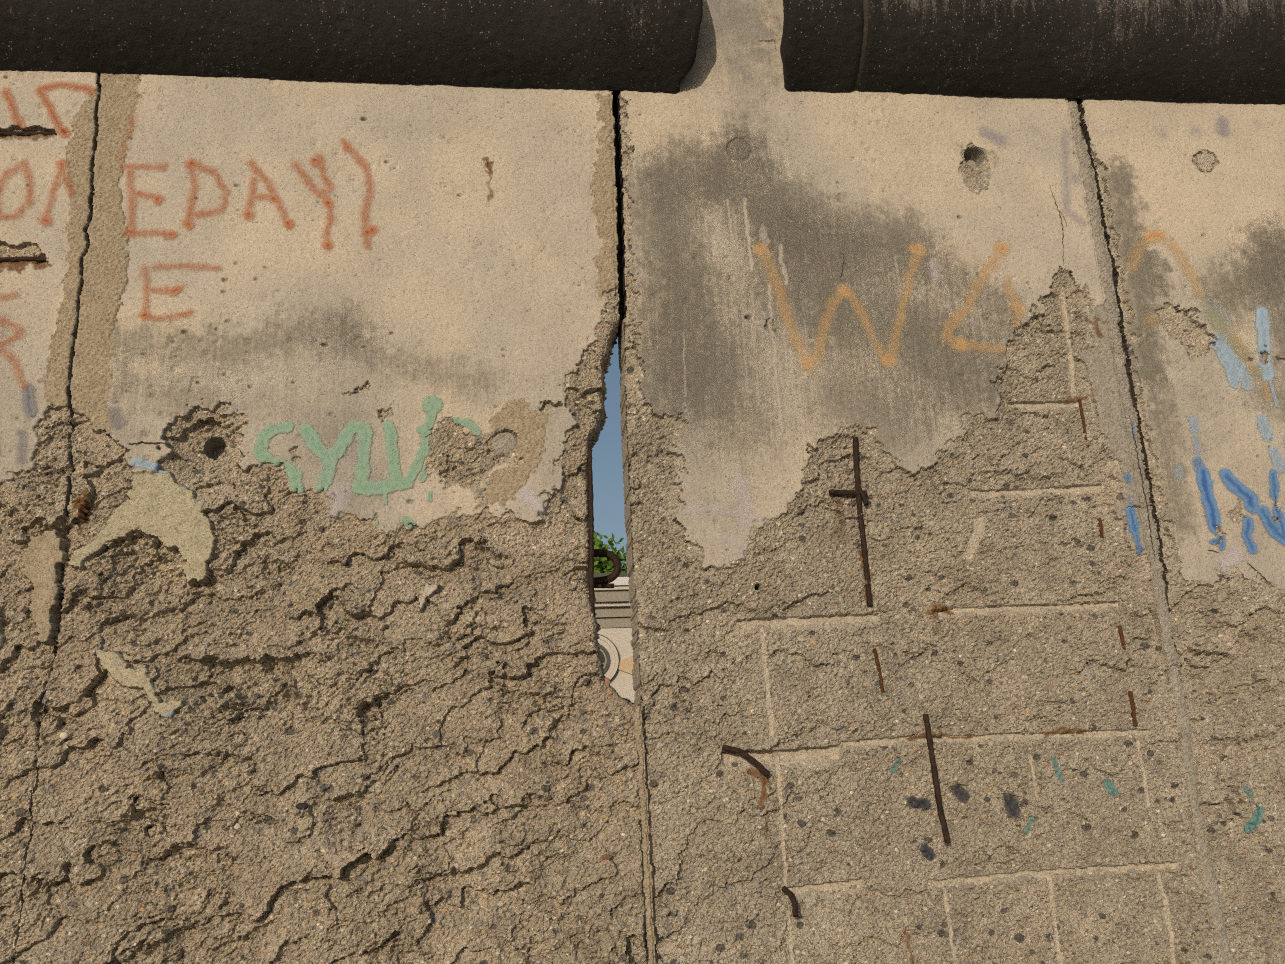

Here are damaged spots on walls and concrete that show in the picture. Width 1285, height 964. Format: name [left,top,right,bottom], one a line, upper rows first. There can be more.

crack [11,572,65,964]
spalling [0,285,647,964]
corrosion [748,768,769,809]
leakage [628,115,1017,452]
spalling [618,93,1222,964]
spalling [1090,143,1285,964]